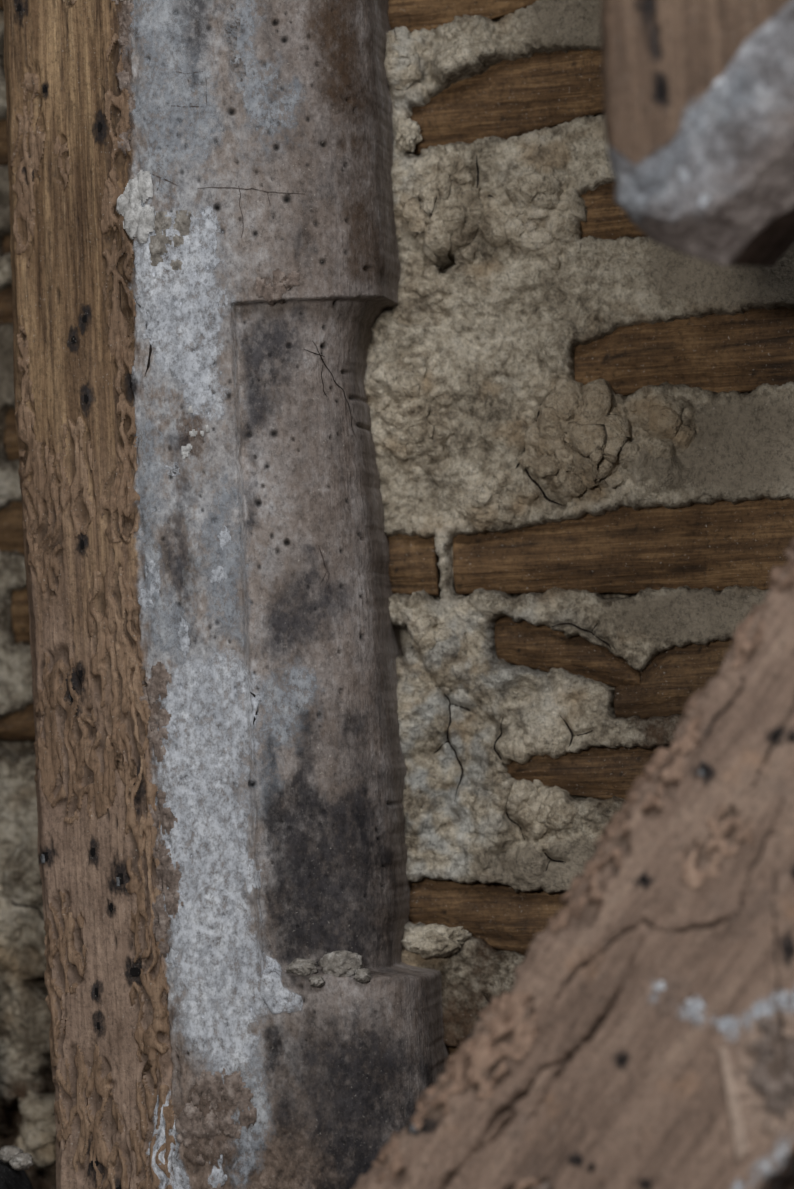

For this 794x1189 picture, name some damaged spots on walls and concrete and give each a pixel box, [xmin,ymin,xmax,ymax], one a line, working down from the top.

leakage [126,373,137,401]
leakage [244,321,294,429]
leakage [164,521,196,611]
leakage [269,581,343,651]
crack [493,718,503,760]
crack [561,717,593,746]
leakage [265,748,391,980]
crack [506,812,565,871]
crack [555,801,790,1056]
leakage [276,1023,437,1189]